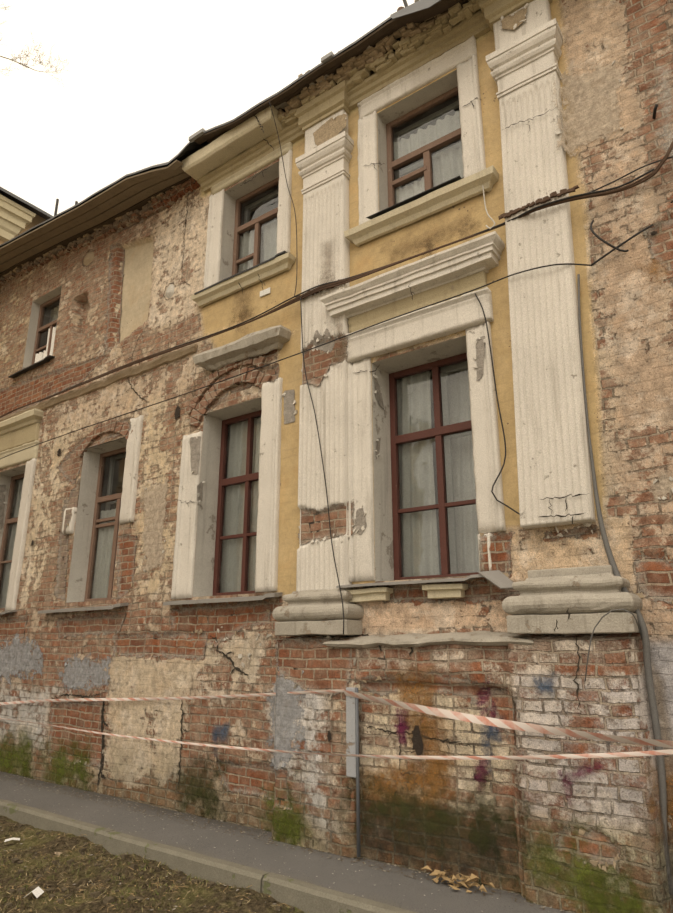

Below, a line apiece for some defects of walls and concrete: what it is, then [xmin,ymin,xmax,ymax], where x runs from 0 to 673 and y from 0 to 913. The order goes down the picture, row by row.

peeling [551,58,624,157]
spalling [643,219,673,273]
spalling [0,177,201,419]
spalling [213,364,279,386]
spalling [281,329,348,424]
peeling [473,336,485,381]
peeling [650,472,673,503]
spalling [298,500,367,545]
peeling [0,616,43,685]
spalling [48,600,271,768]
crack [210,636,248,676]
crack [50,692,108,791]